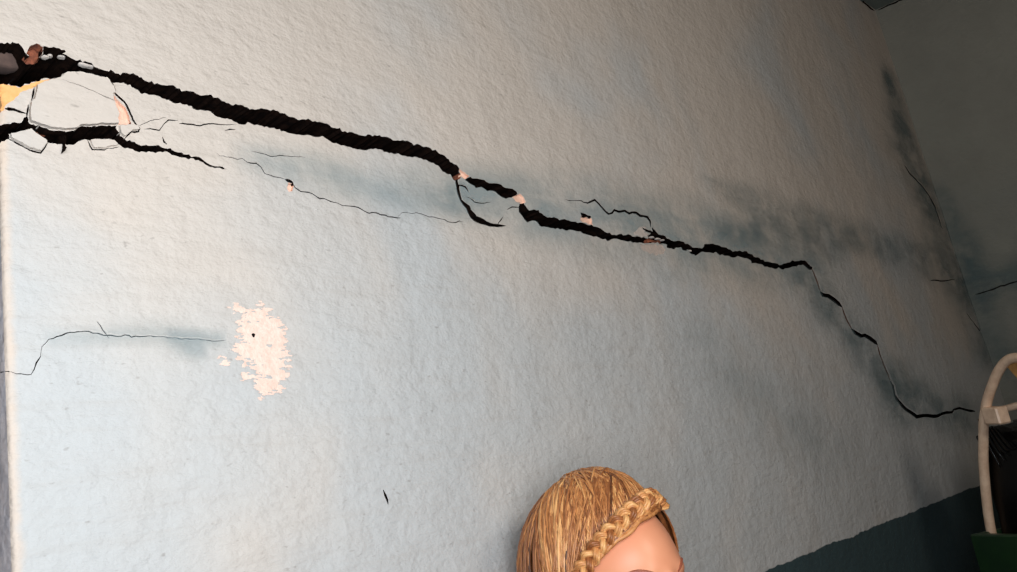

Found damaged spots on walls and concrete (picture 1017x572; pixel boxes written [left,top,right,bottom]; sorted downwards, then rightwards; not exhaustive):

spalling [0,43,65,112]
spalling [36,132,67,154]
leakage [460,185,494,200]
crack [0,42,975,419]
crack [966,281,1017,331]
peeling [217,301,292,400]